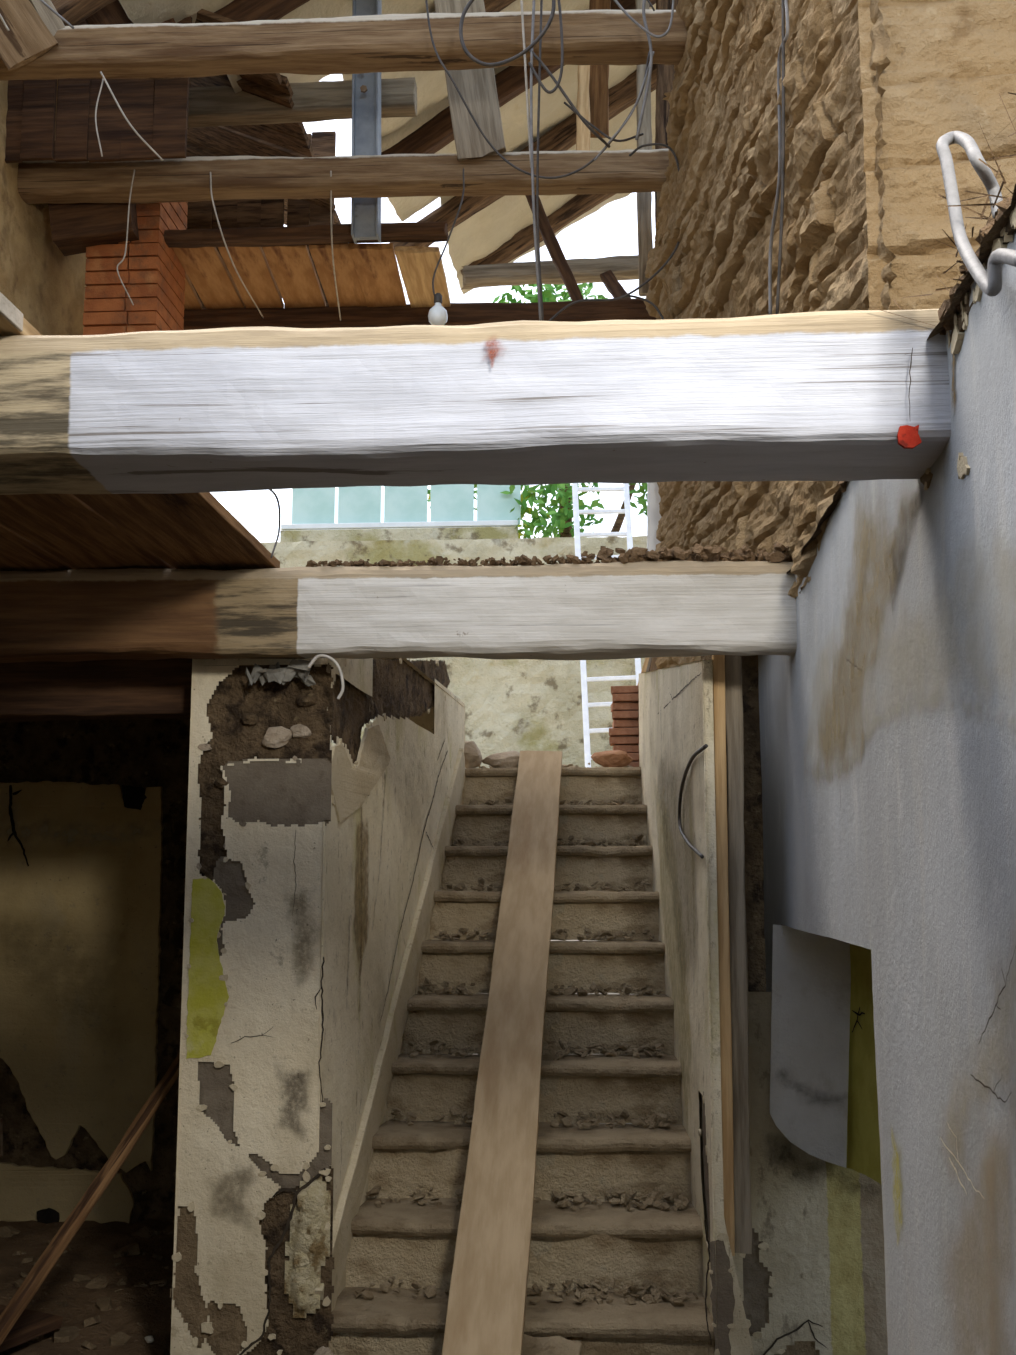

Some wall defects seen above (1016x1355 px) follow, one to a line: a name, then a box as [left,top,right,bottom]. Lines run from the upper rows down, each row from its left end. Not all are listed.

leakage [820,518,901,760]
spalling [122,785,147,810]
spalling [170,658,450,1355]
crack [979,947,1016,1043]
crack [971,1075,1012,1103]
spalling [37,1208,60,1224]
crack [239,1168,326,1355]
spalling [698,1091,777,1355]
peeling [774,1341,820,1355]